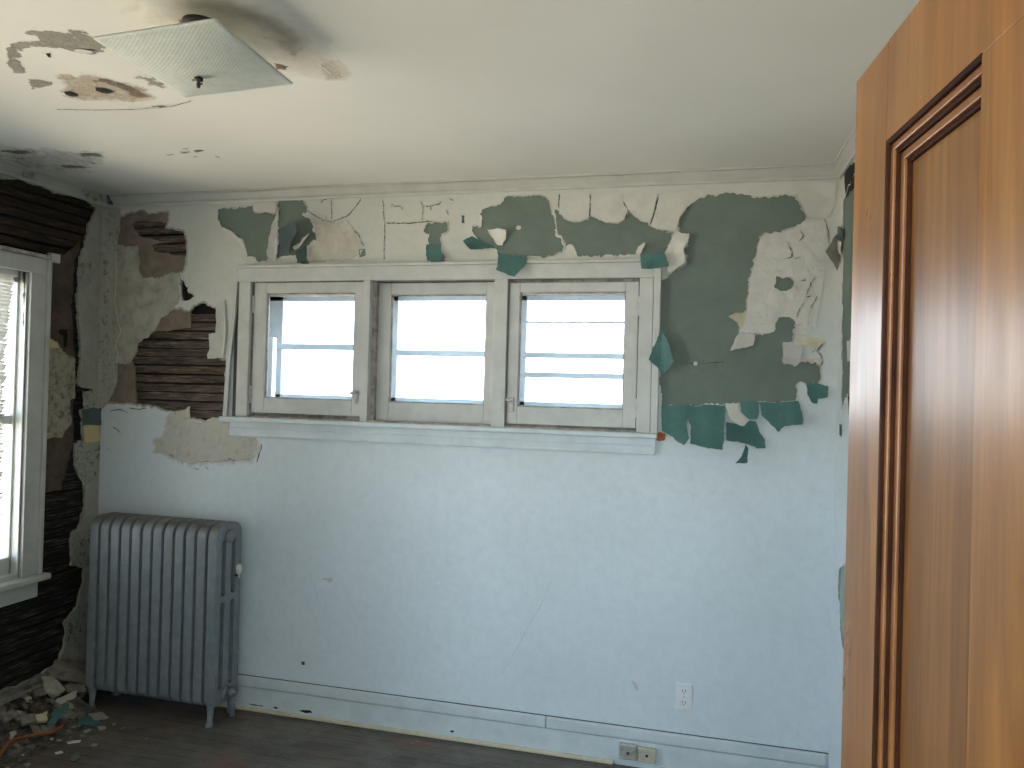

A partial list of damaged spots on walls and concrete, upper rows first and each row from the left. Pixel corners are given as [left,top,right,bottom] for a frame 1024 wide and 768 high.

peeling [216,200,318,264]
crack [309,197,454,260]
peeling [422,221,450,262]
peeling [462,189,828,463]
flaking render [60,189,260,660]